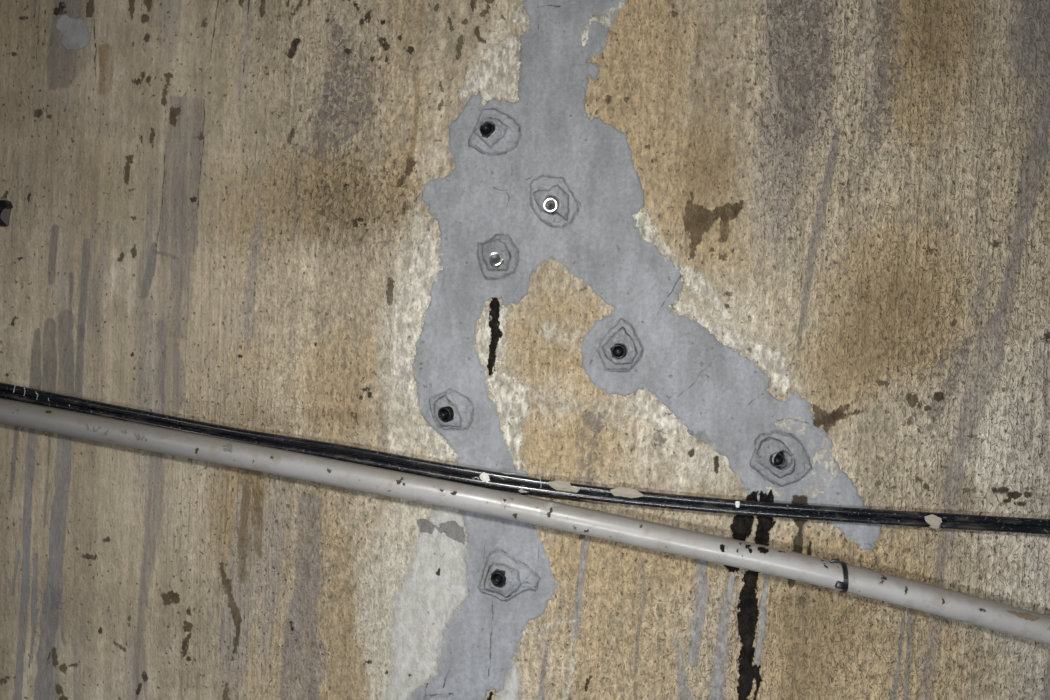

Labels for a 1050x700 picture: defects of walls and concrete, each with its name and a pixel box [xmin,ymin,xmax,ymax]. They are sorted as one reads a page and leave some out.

leakage [31,242,89,398]
leakage [632,195,799,395]
leakage [801,131,839,324]
leakage [10,426,71,700]
leakage [532,535,591,700]
leakage [678,559,708,700]
leakage [710,565,769,700]
leakage [730,515,776,546]
leakage [745,487,779,502]
leakage [793,519,812,555]
leakage [791,447,839,505]
leakage [775,401,864,434]